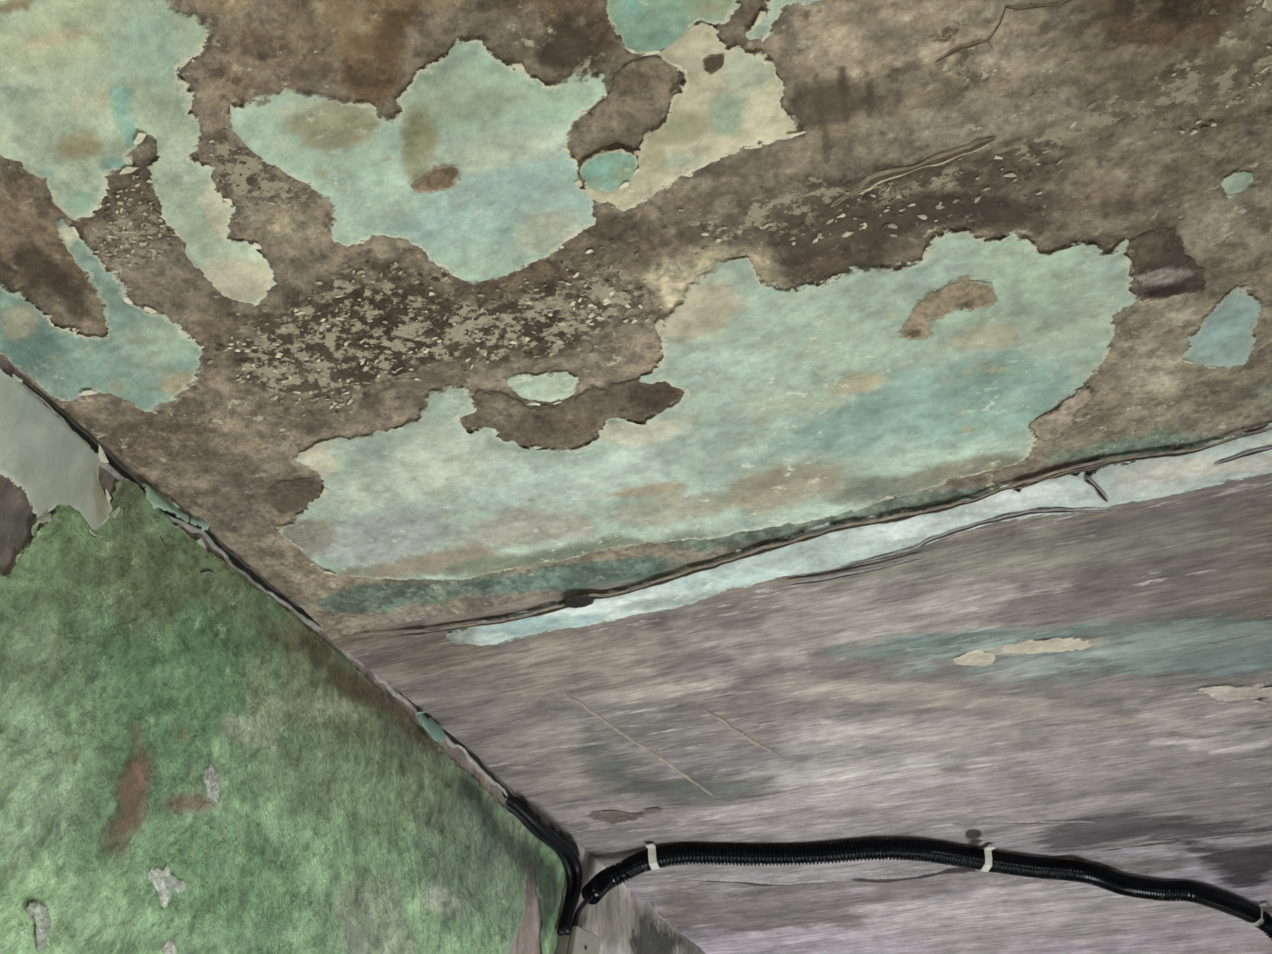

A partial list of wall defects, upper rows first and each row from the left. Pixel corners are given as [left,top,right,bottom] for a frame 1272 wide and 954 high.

damp [537,34,592,69]
peeling [743,0,821,42]
flaking render [985,46,1272,182]
flaking render [680,158,991,257]
damp [773,195,1029,262]
peeling [1220,171,1253,199]
damp [16,245,88,321]
peeling [1181,284,1264,370]
peeling [264,226,1206,581]
peeling [0,0,807,954]
crack [21,381,1272,811]
peeling [934,618,1272,704]